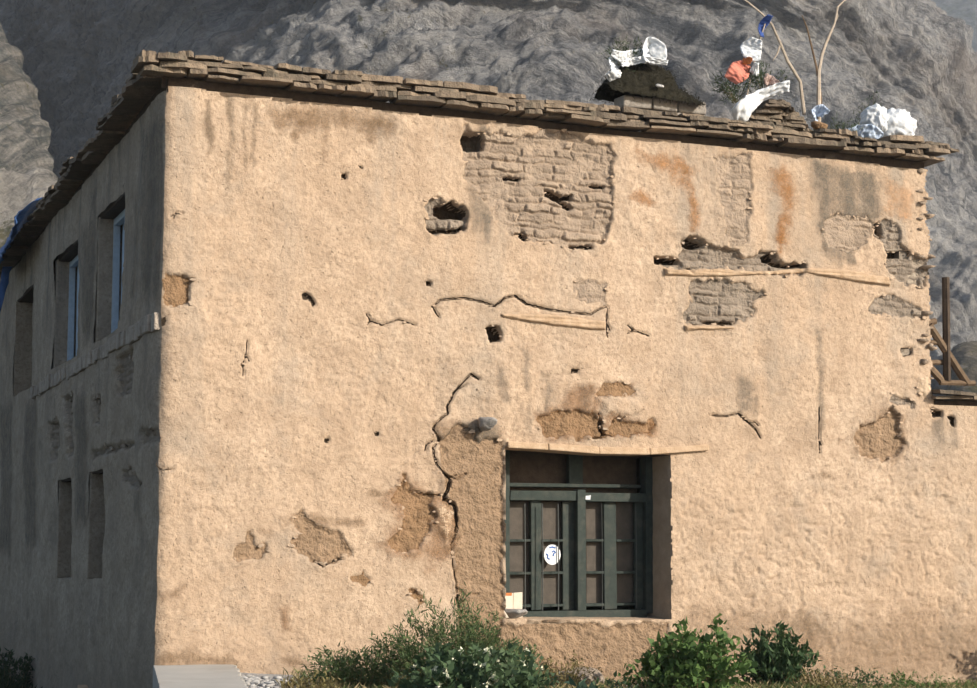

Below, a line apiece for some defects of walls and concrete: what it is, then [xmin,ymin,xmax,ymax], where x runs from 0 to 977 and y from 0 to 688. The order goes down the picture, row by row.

flaking render [460,124,616,251]
flaking render [423,197,468,236]
flaking render [656,152,806,326]
flaking render [821,211,929,288]
crack [366,313,414,325]
crack [431,295,649,338]
flaking render [868,294,927,320]
flaking render [536,409,656,442]
crack [718,413,761,438]
crack [415,373,479,606]
flaking render [287,510,352,564]
flaking render [435,423,669,683]